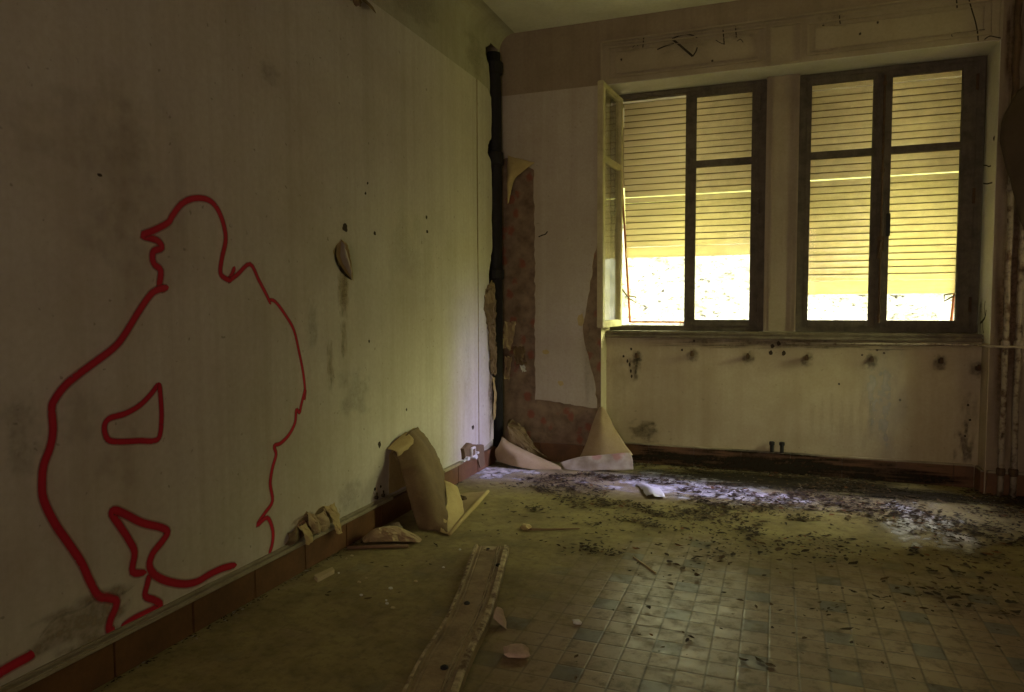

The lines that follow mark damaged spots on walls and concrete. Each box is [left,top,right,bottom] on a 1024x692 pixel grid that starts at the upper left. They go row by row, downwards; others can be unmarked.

peeling [333,240,354,281]
peeling [484,280,528,420]